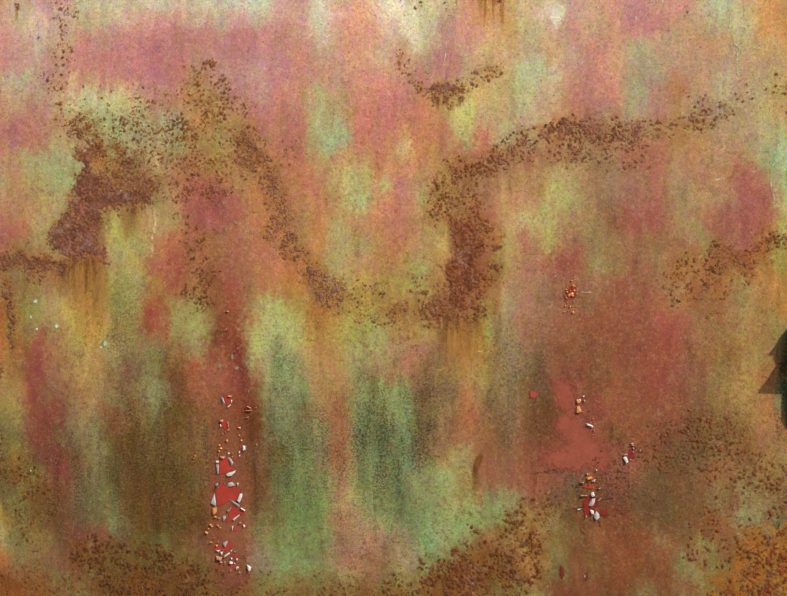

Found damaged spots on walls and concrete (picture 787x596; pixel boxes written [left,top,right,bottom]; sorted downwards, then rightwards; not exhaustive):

rust [37,0,83,90]
rust [0,49,754,355]
rust [654,232,787,317]
rust [0,430,250,596]
peeling [205,395,257,575]
rust [371,450,656,596]
peeling [538,376,614,520]
rust [625,408,787,596]